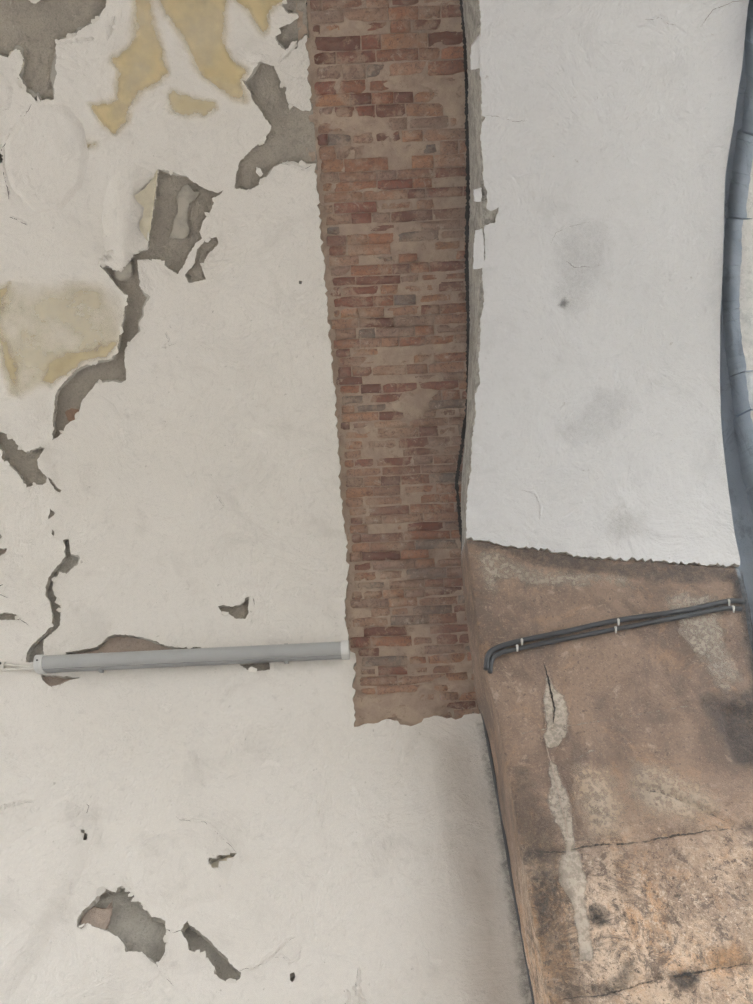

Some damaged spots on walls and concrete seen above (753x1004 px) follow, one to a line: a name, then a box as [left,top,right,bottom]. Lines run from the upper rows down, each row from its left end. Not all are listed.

flaking render [0,0,106,100]
leakage [92,0,167,133]
leakage [161,0,282,97]
crack [0,104,31,224]
flaking render [235,62,318,190]
flaking render [0,169,223,492]
leakage [528,665,632,1004]
crack [528,790,745,853]
flaking render [77,886,168,964]
flaking render [182,923,241,984]
crack [566,963,748,999]
leakage [672,971,699,986]